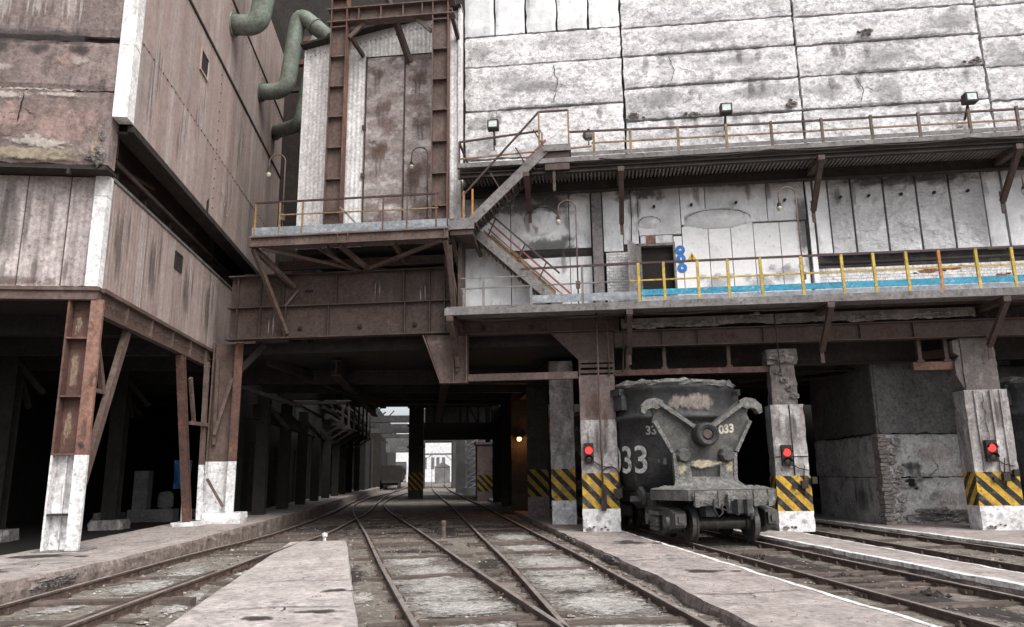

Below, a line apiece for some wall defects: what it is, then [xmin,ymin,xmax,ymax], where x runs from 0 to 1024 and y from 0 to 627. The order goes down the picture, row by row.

rust [372,144,387,160]
rust [408,164,420,185]
rust [69,355,78,386]
spalling [767,350,799,398]
rust [64,412,86,448]